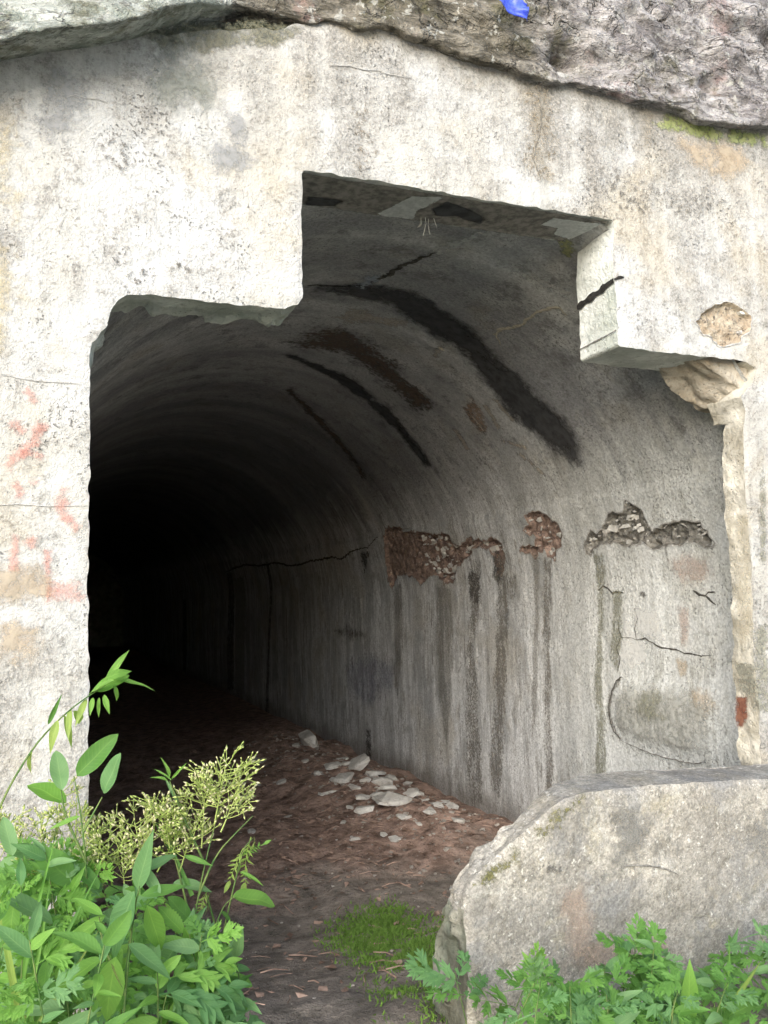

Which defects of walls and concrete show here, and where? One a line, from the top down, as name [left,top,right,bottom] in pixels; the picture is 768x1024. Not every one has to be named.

crack [308,252,437,287]
crack [493,276,624,345]
spalling [694,300,753,348]
water stain [284,275,581,478]
crack [227,537,378,572]
spalling [382,525,506,590]
spalling [519,510,563,563]
spalling [584,499,717,556]
crack [598,585,709,669]
water stain [465,551,516,806]
water stain [543,559,554,789]